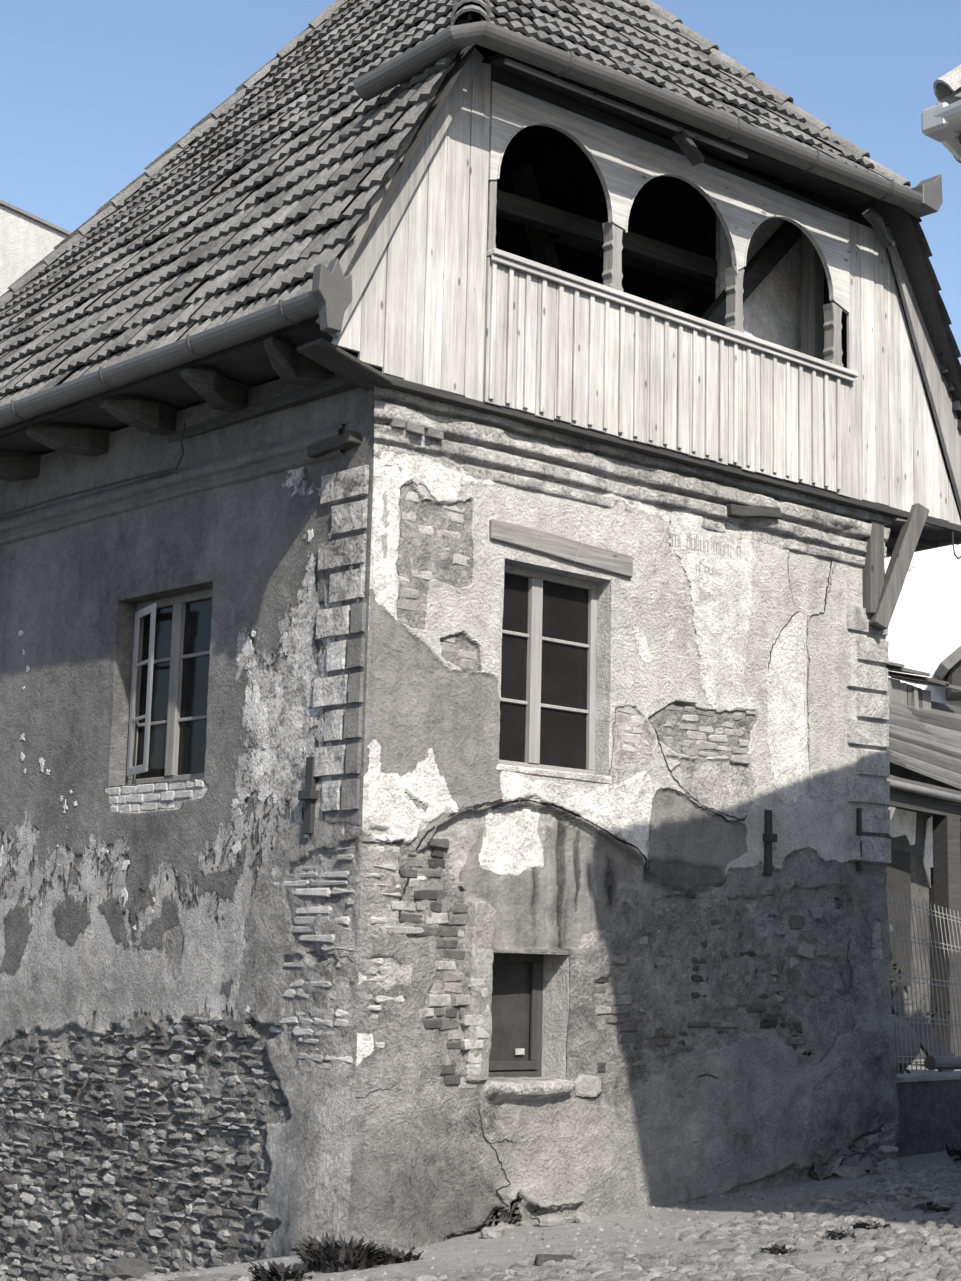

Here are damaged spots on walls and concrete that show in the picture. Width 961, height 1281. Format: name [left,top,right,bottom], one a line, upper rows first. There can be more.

peeling [282,465,337,503]
crack [767,547,838,798]
flaking render [0,483,899,1259]
crack [443,1102,586,1241]